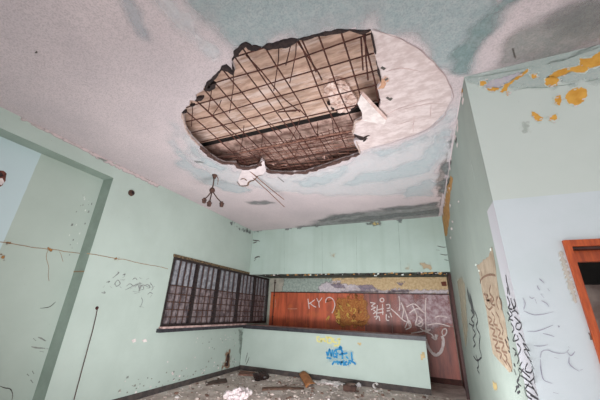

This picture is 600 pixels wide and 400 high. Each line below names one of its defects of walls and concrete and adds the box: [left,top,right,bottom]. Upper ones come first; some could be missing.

water stain [452,0,516,73]
water stain [502,3,600,64]
peeling [479,52,600,123]
water stain [181,127,452,230]
peeling [442,157,453,239]
peeling [262,272,450,294]
peeling [475,248,513,373]